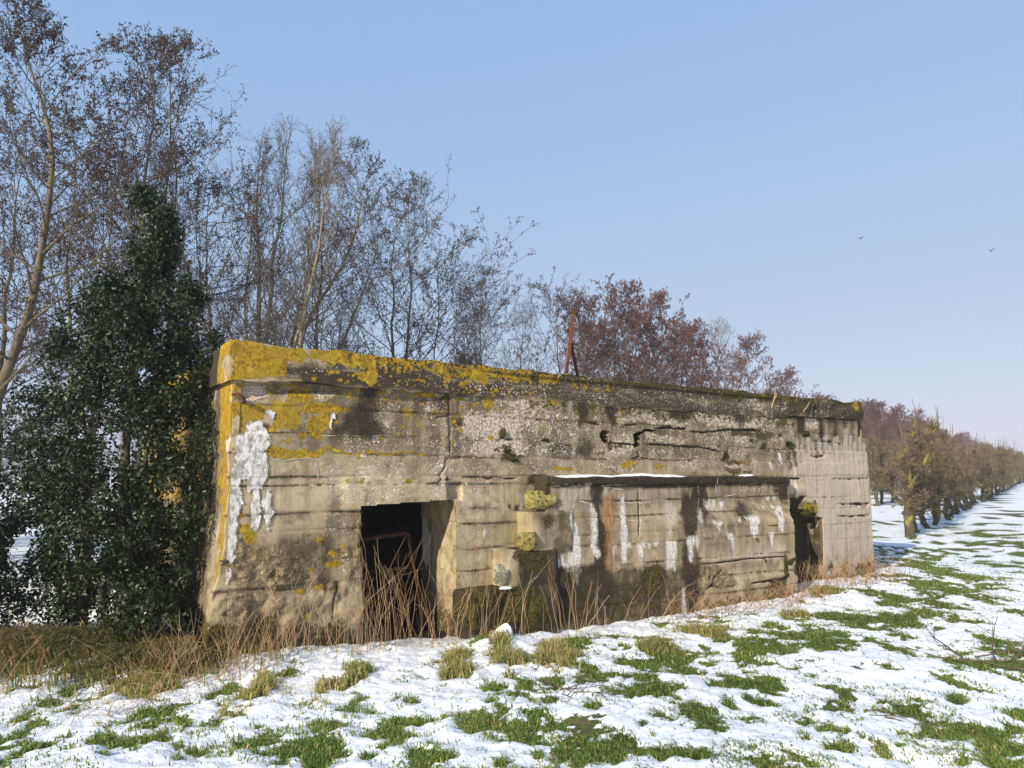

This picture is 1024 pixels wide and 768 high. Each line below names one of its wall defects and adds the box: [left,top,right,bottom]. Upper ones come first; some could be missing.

crack [588,417,760,502]
rust [600,494,616,573]
damp [558,418,874,614]